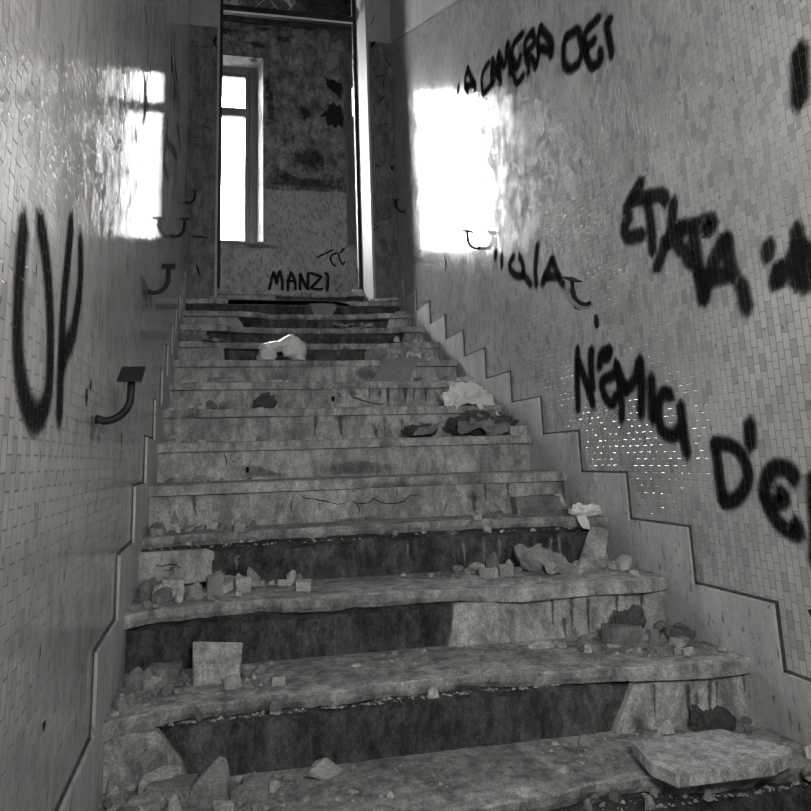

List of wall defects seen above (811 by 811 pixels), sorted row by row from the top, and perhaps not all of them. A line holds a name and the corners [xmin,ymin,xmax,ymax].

crack [291,489,417,515]
spalling [645,795,657,811]